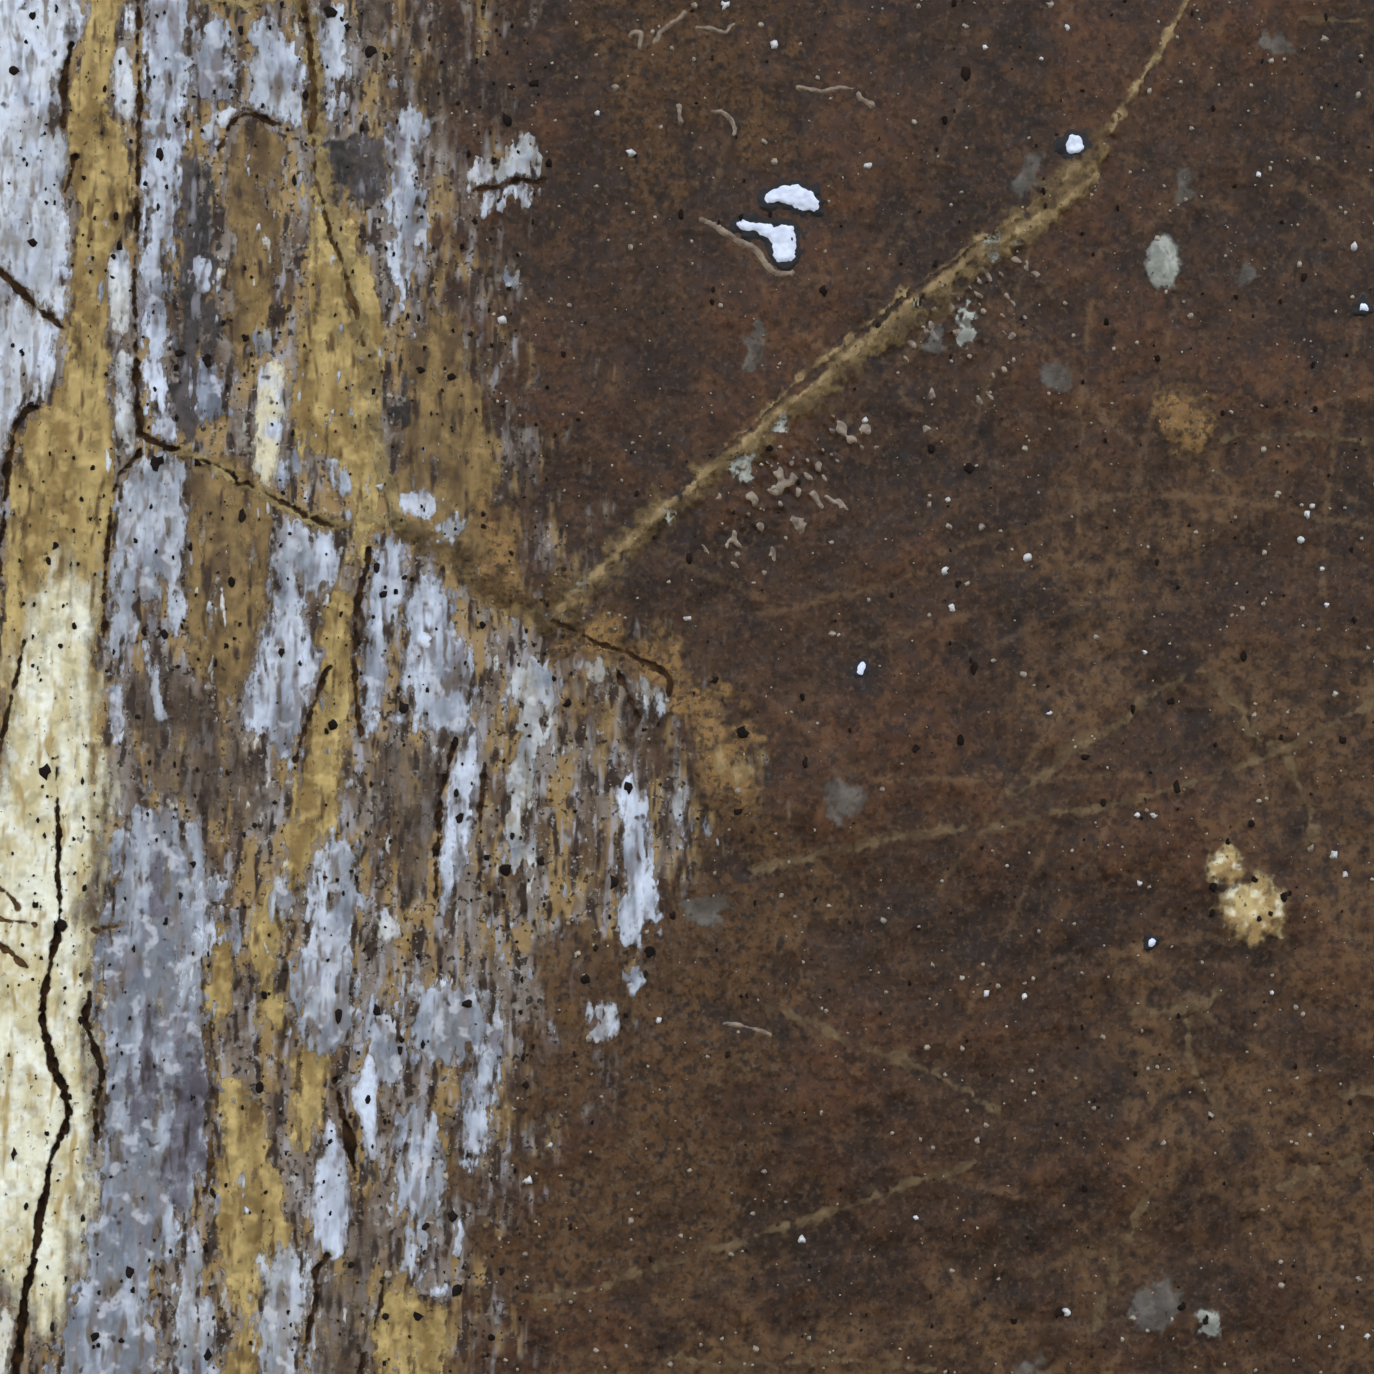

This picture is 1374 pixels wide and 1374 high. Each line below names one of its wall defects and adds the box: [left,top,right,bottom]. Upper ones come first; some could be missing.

corrosion [580,0,802,232]
crack [0,268,64,329]
peeling [0,0,605,1374]
crack [292,546,372,763]
crack [550,619,674,721]
peeling [573,772,729,1057]
crack [0,767,118,1374]
corrosion [431,1153,480,1207]
corrosion [460,794,868,1314]